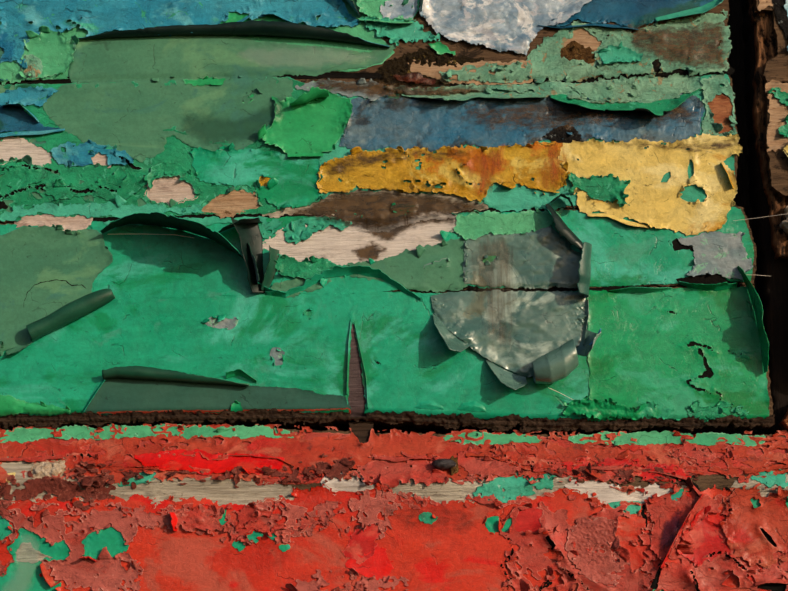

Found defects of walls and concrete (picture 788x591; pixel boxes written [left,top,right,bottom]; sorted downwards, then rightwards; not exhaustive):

peeling [755,0,774,12]
peeling [0,0,753,390]
peeling [266,321,368,417]
crack [686,341,742,402]
peeling [0,410,294,444]
peeling [183,400,250,414]
peeling [563,395,749,422]
peeling [0,430,788,591]